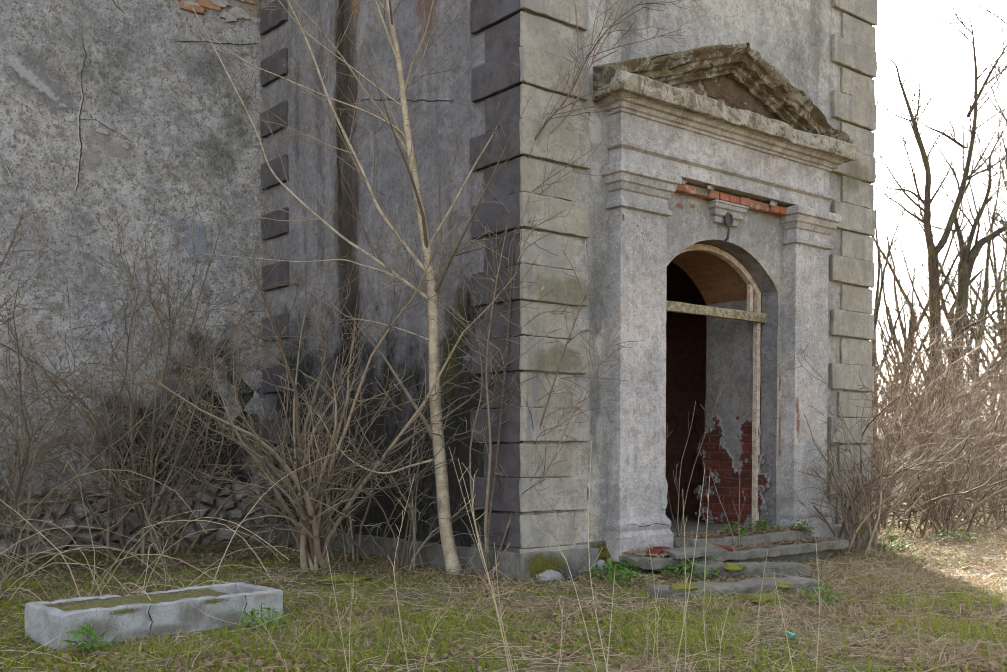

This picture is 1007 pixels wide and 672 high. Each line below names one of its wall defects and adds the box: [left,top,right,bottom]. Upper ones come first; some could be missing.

flaking render [173,0,259,22]
flaking render [702,75,776,119]
flaking render [694,415,770,526]